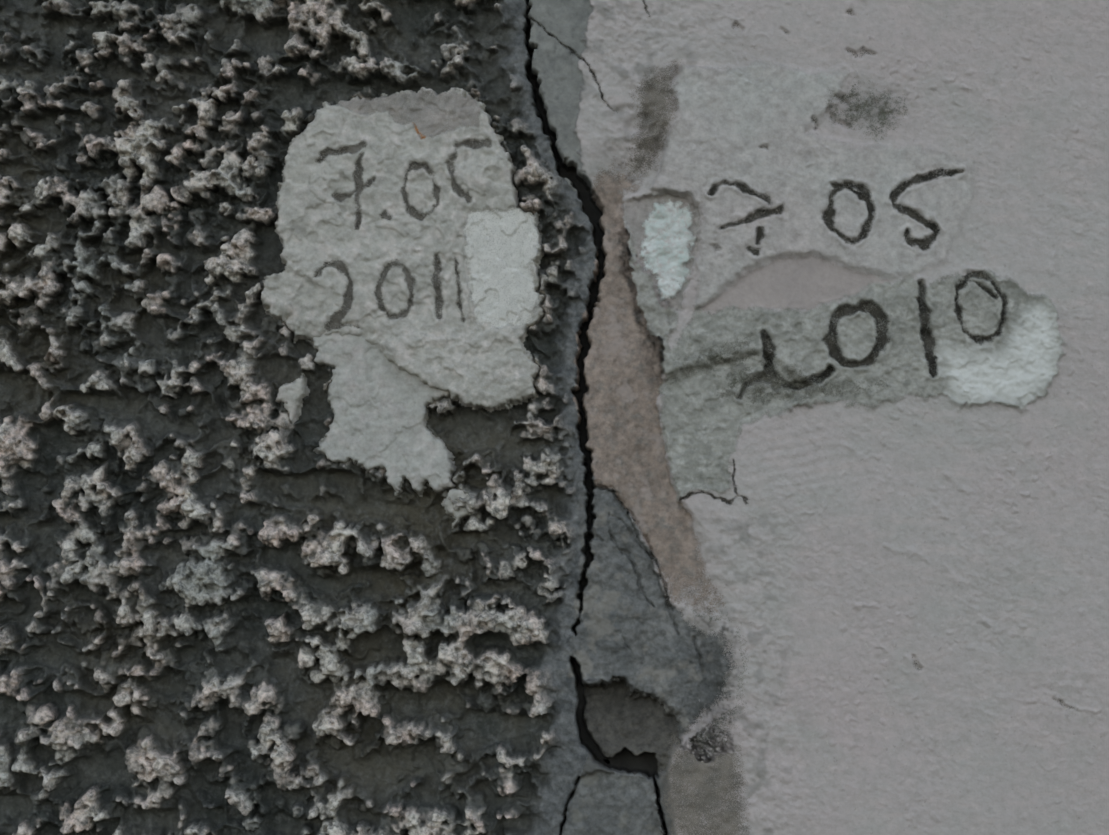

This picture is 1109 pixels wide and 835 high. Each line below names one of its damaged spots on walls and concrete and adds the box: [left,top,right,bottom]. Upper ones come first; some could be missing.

crack [525,0,673,630]
spalling [523,0,737,777]
crack [560,657,612,835]
crack [653,773,667,835]